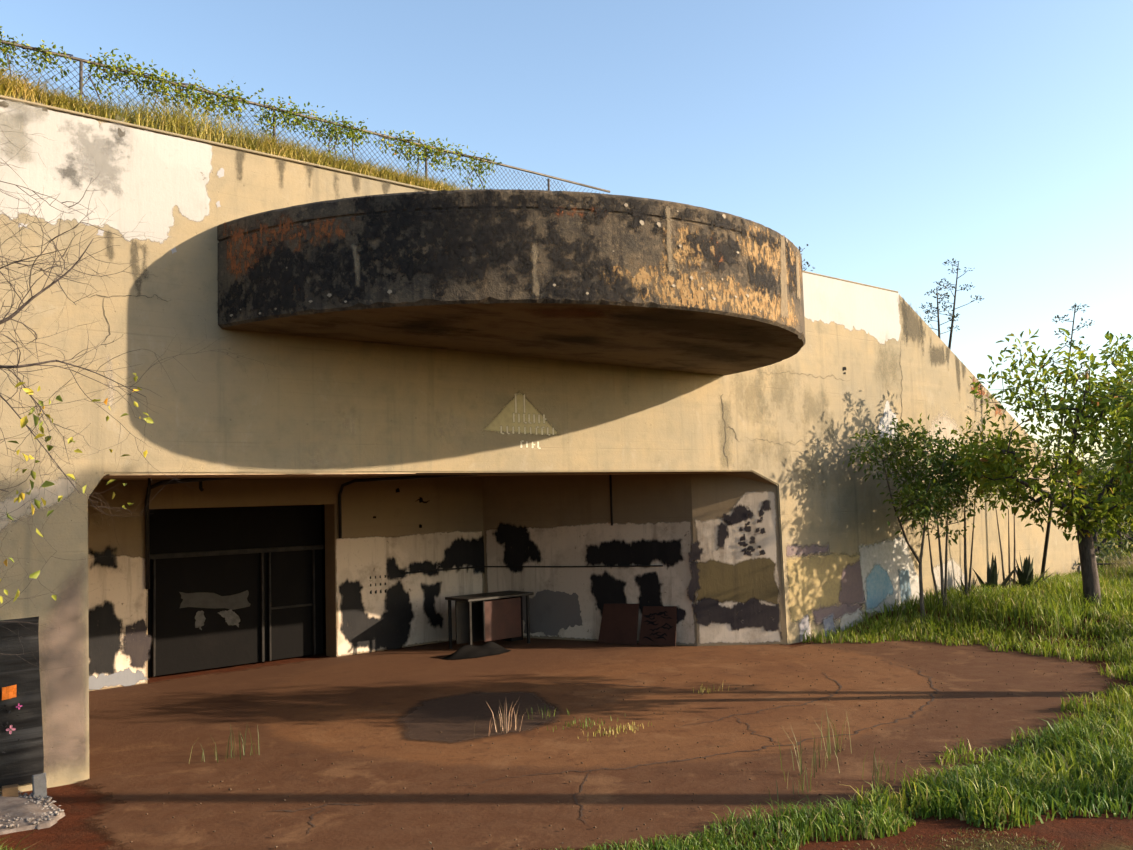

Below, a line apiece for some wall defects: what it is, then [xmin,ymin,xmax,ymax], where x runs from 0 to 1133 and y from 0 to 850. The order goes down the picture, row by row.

peeling [0,100,224,254]
damp [666,208,674,271]
peeling [600,220,901,344]
damp [780,236,801,318]
damp [899,299,965,389]
crack [721,394,827,470]